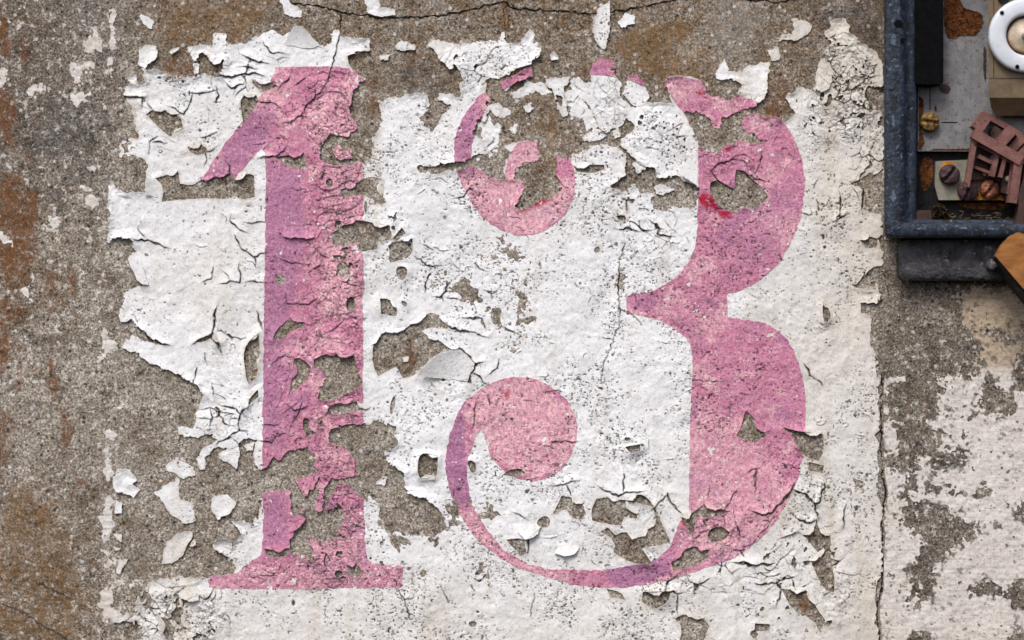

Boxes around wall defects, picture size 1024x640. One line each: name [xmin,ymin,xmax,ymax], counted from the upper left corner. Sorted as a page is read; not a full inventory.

crack [174,0,676,123]
peeling [545,67,649,142]
peeling [592,1,635,49]
crack [747,0,795,8]
peeling [156,170,255,202]
peeling [326,177,413,280]
peeling [370,298,452,378]
crack [876,271,896,640]
peeling [878,266,1024,611]
peeling [154,458,196,564]
peeling [537,491,670,564]
peeling [780,516,835,633]